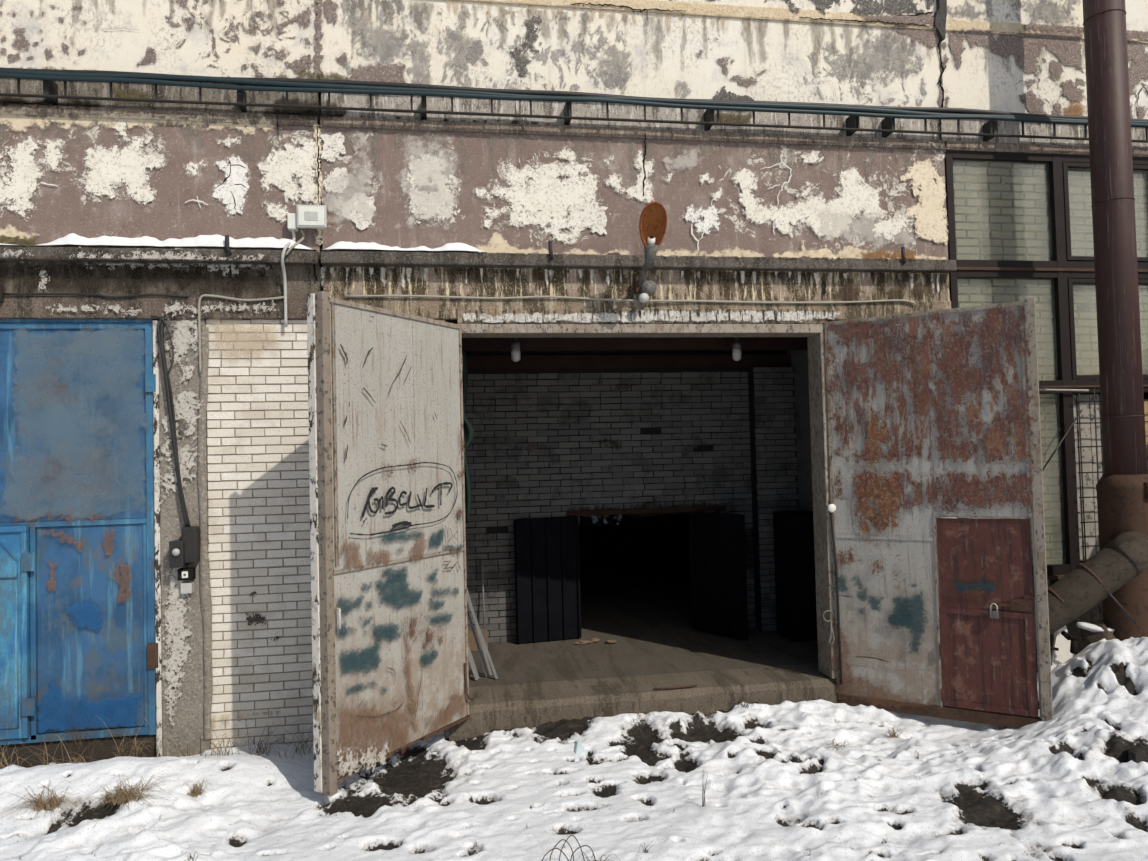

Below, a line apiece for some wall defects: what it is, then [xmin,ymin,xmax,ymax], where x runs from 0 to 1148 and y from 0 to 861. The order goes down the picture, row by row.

peeling [136,0,632,95]
crack [799,12,947,140]
peeling [765,0,1087,115]
peeling [185,122,384,245]
peeling [400,140,672,248]
peeling [682,138,949,256]
water stain [620,309,746,318]
water stain [656,241,947,300]
corrosion [852,409,905,536]
corrosion [47,561,57,590]
corrosion [16,513,115,555]
corrosion [113,563,132,603]